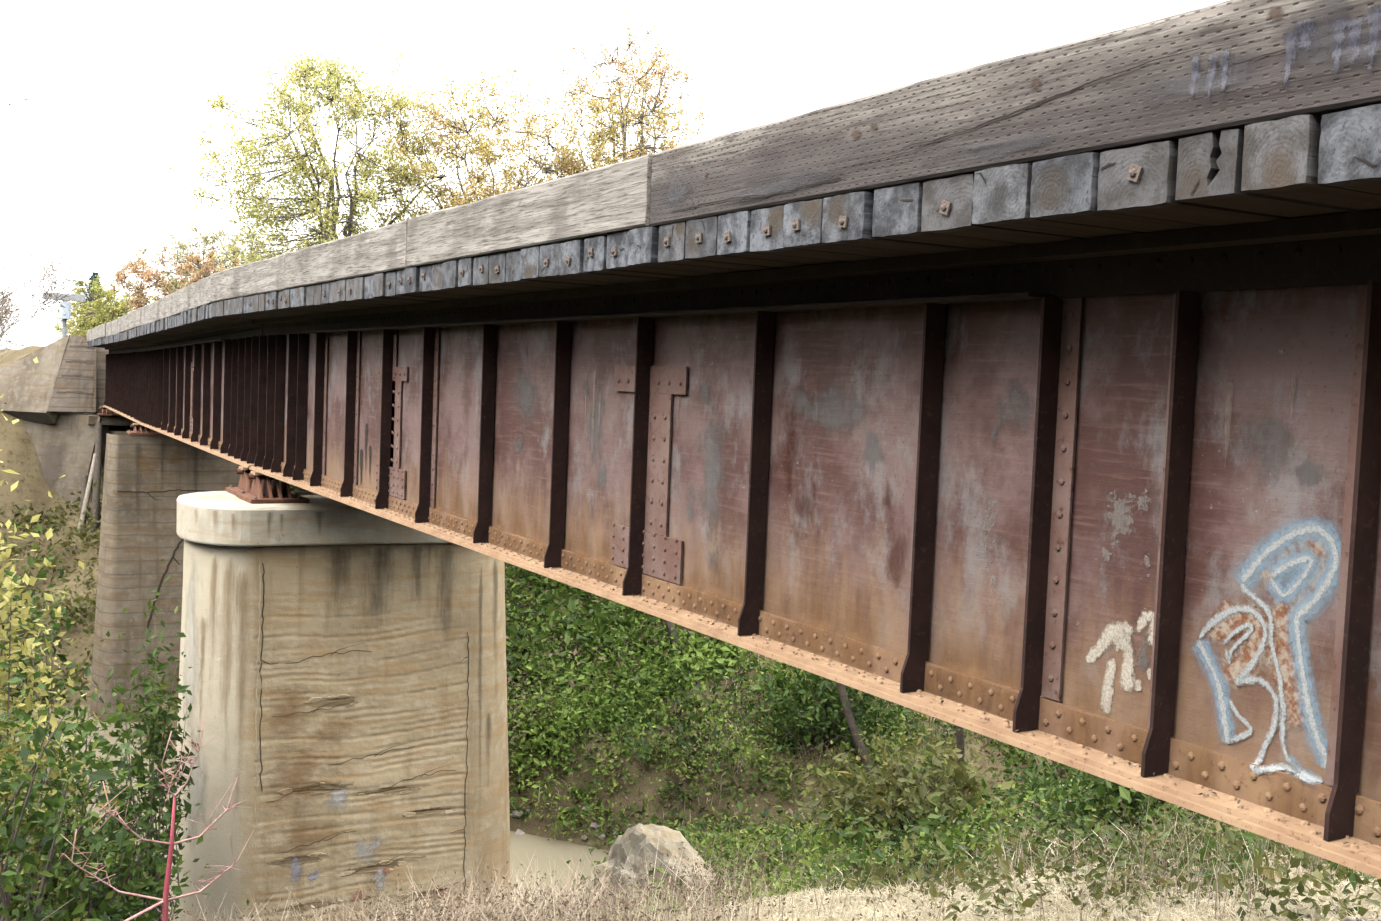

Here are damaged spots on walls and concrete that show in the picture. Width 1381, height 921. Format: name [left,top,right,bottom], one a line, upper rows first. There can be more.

crack [586,26,1351,262]
peeling [1095,489,1161,562]
rust [561,543,609,582]
rust [682,572,742,625]
rust [773,610,825,653]
rust [843,623,866,667]
rust [928,662,1013,719]
rust [1068,713,1092,746]
rust [1126,738,1144,764]
rust [1192,758,1207,786]
rust [1279,796,1309,821]